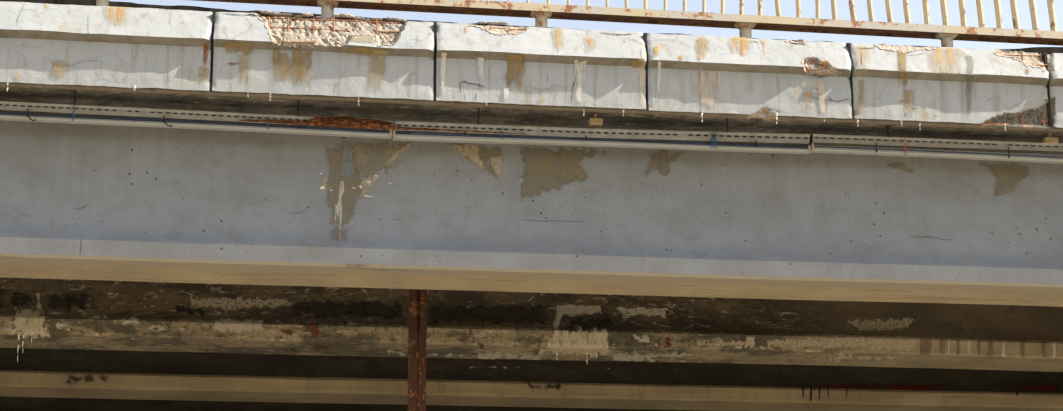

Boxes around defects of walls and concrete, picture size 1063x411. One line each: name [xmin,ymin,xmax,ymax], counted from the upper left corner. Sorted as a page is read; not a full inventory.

spalling [253,10,407,48]
water stain [274,50,311,80]
water stain [346,47,387,83]
water stain [504,54,526,98]
spalling [802,57,841,78]
spalling [994,49,1054,74]
rust [238,116,524,139]
spalling [976,92,1056,131]
water stain [327,148,362,240]
water stain [0,290,139,339]
water stain [427,296,1005,369]